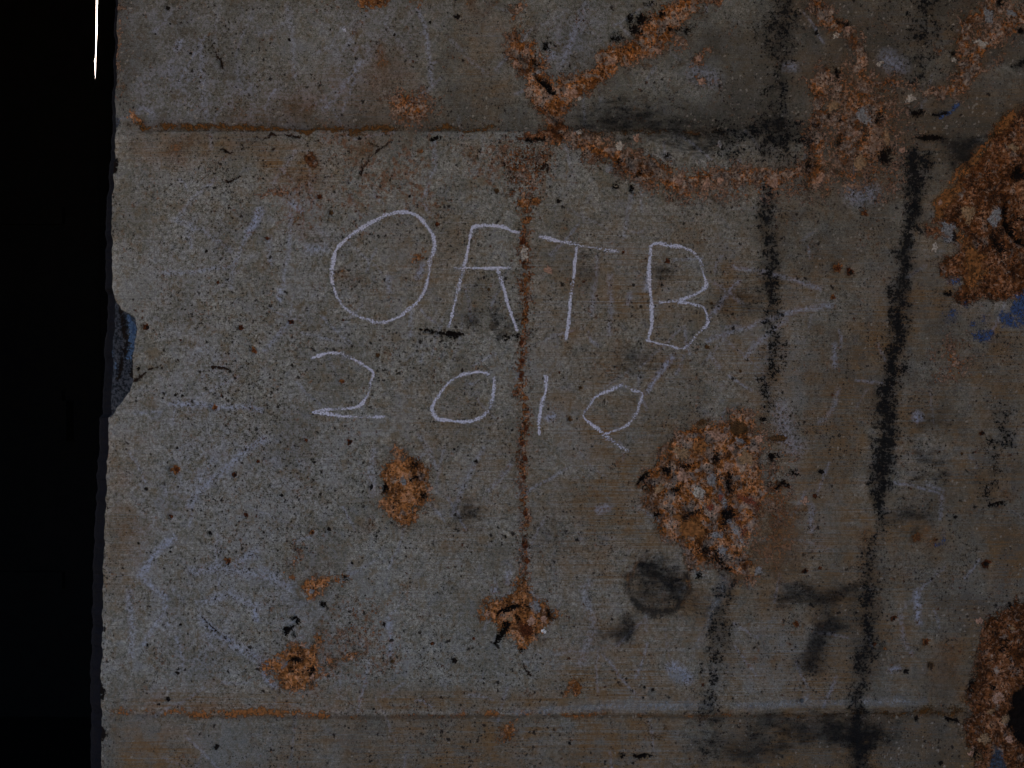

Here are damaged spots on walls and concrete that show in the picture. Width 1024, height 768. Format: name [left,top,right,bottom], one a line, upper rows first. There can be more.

leakage [577,0,820,412]
rust [378,440,439,533]
leakage [592,135,988,768]
rust [113,604,385,720]
rust [477,574,563,654]